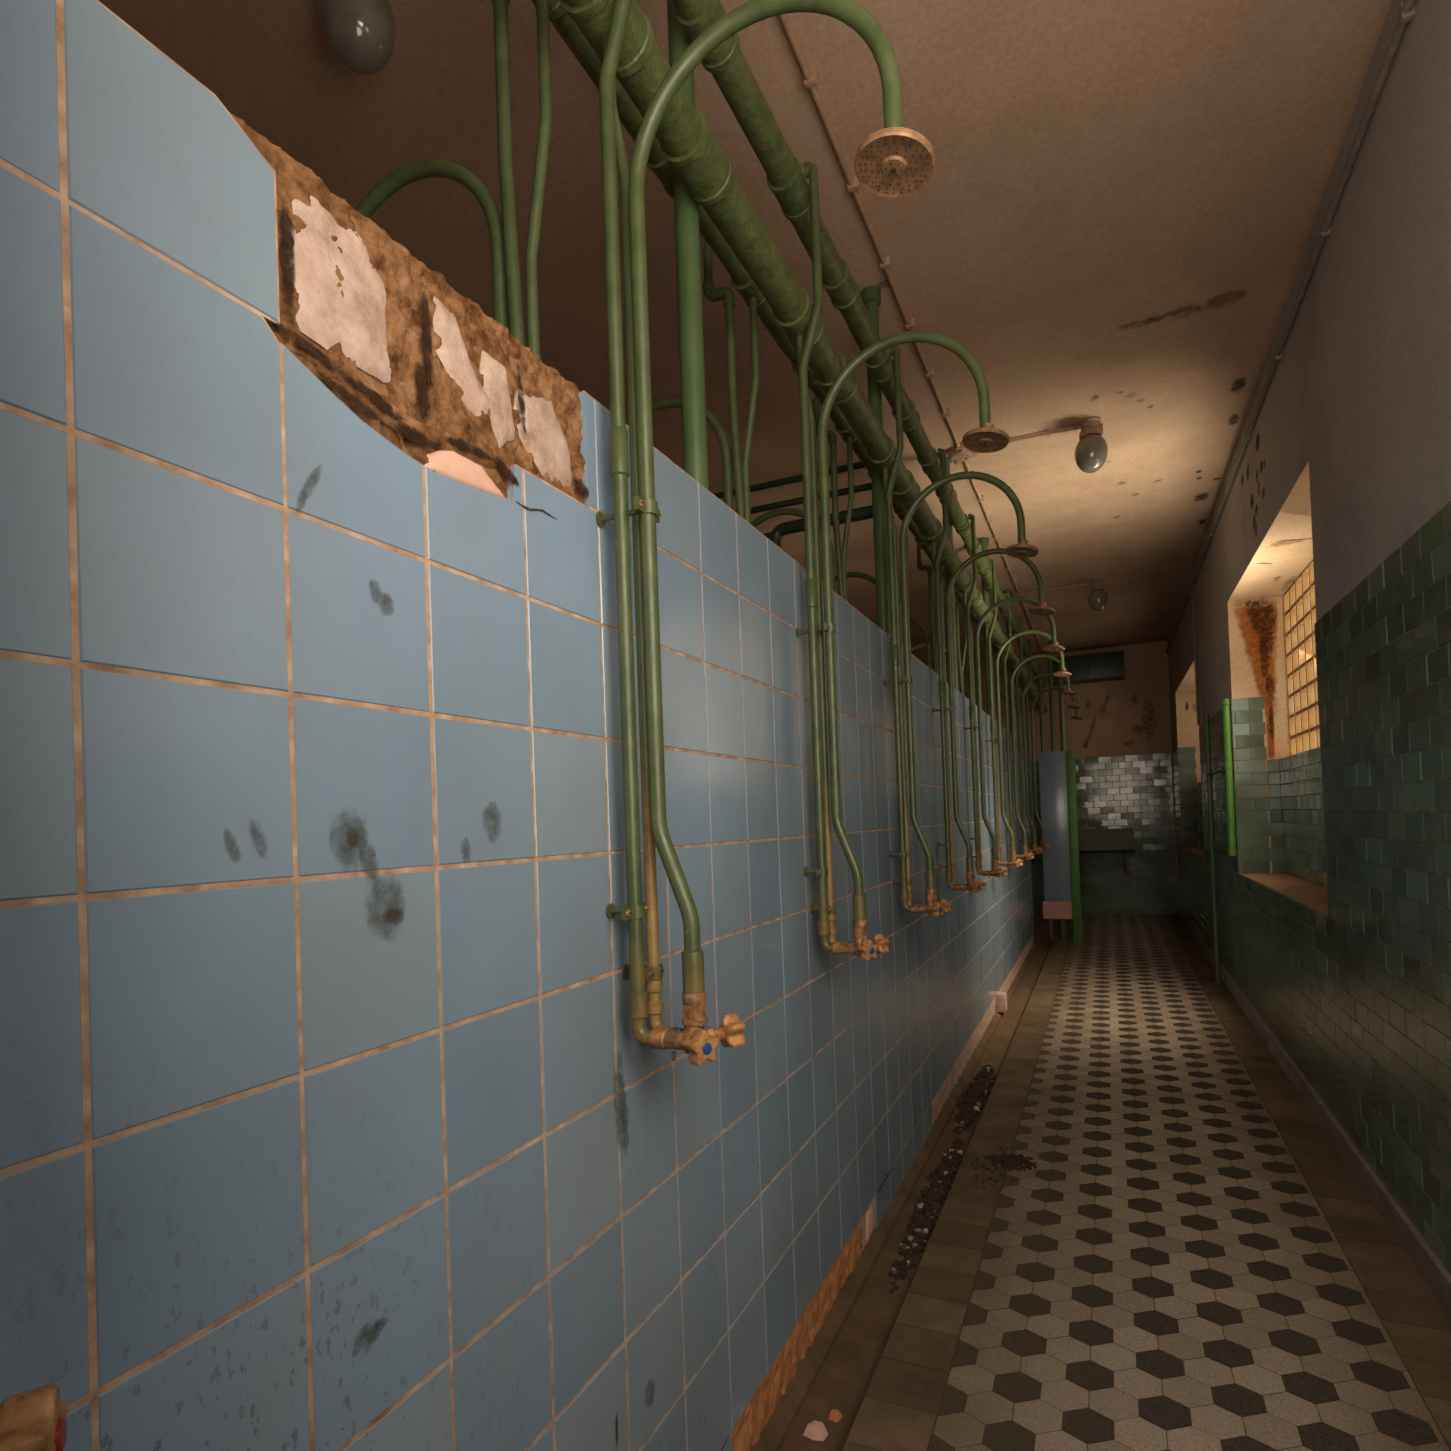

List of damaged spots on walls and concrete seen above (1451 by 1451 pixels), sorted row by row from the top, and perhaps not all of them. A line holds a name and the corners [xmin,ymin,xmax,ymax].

spalling [229,112,589,504]
water stain [341,821,401,934]